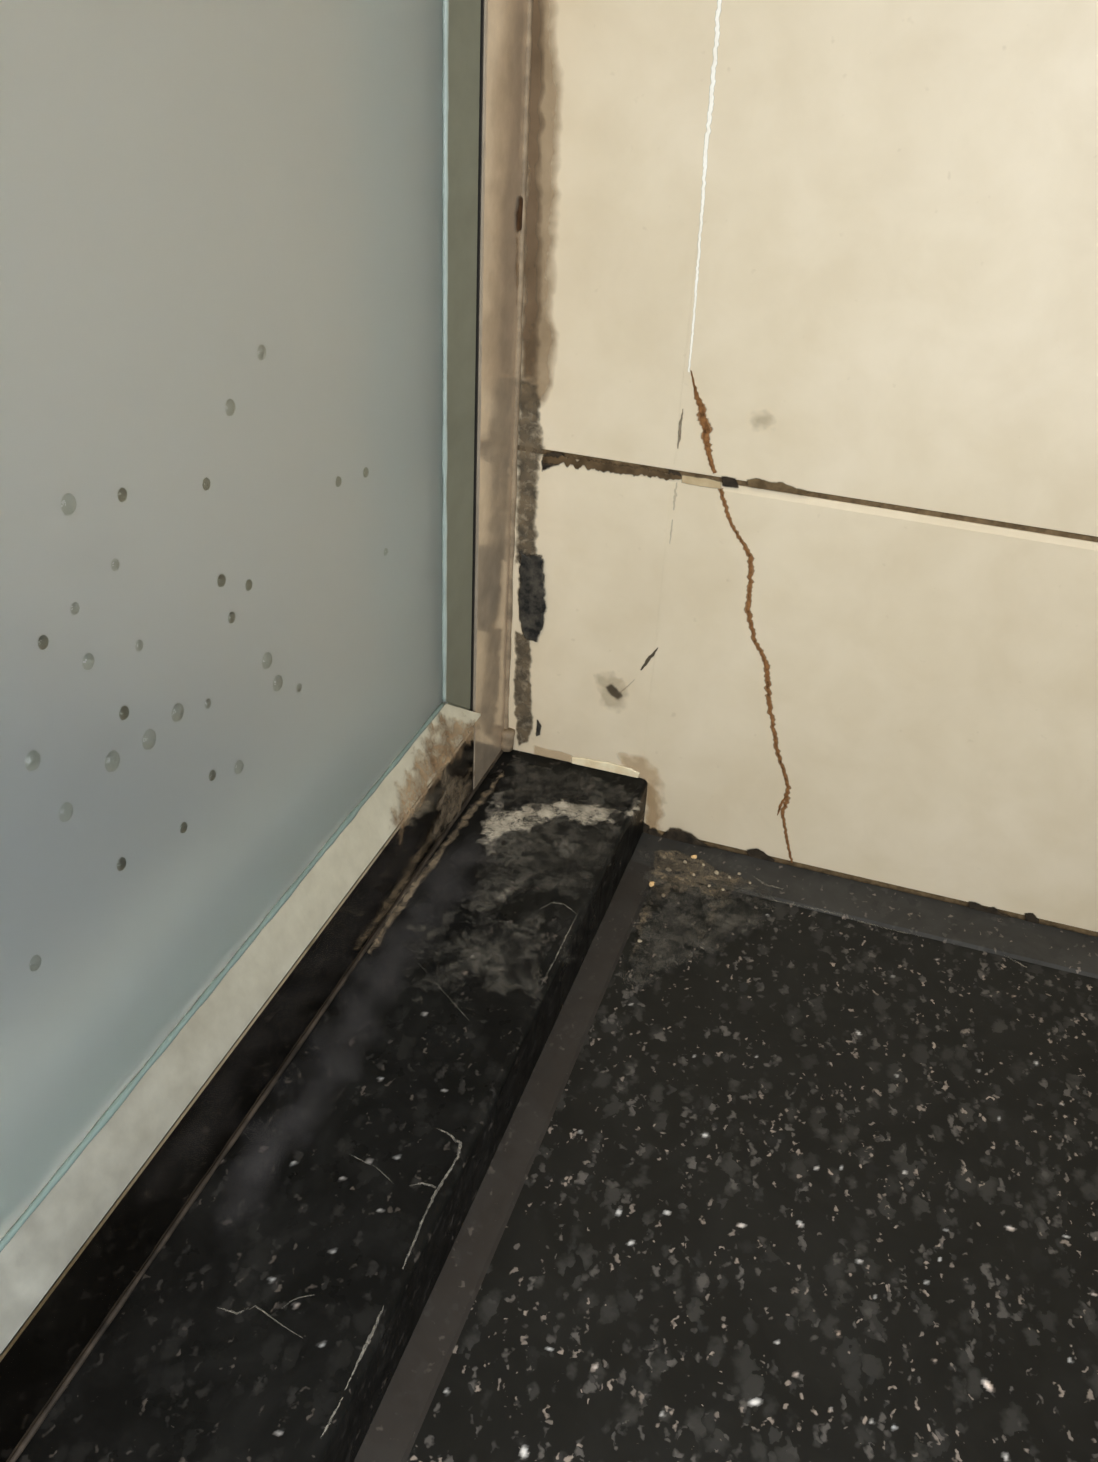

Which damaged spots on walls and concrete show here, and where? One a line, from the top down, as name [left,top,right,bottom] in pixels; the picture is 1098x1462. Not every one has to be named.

water stain [514,0,546,745]
crack [690,370,793,863]